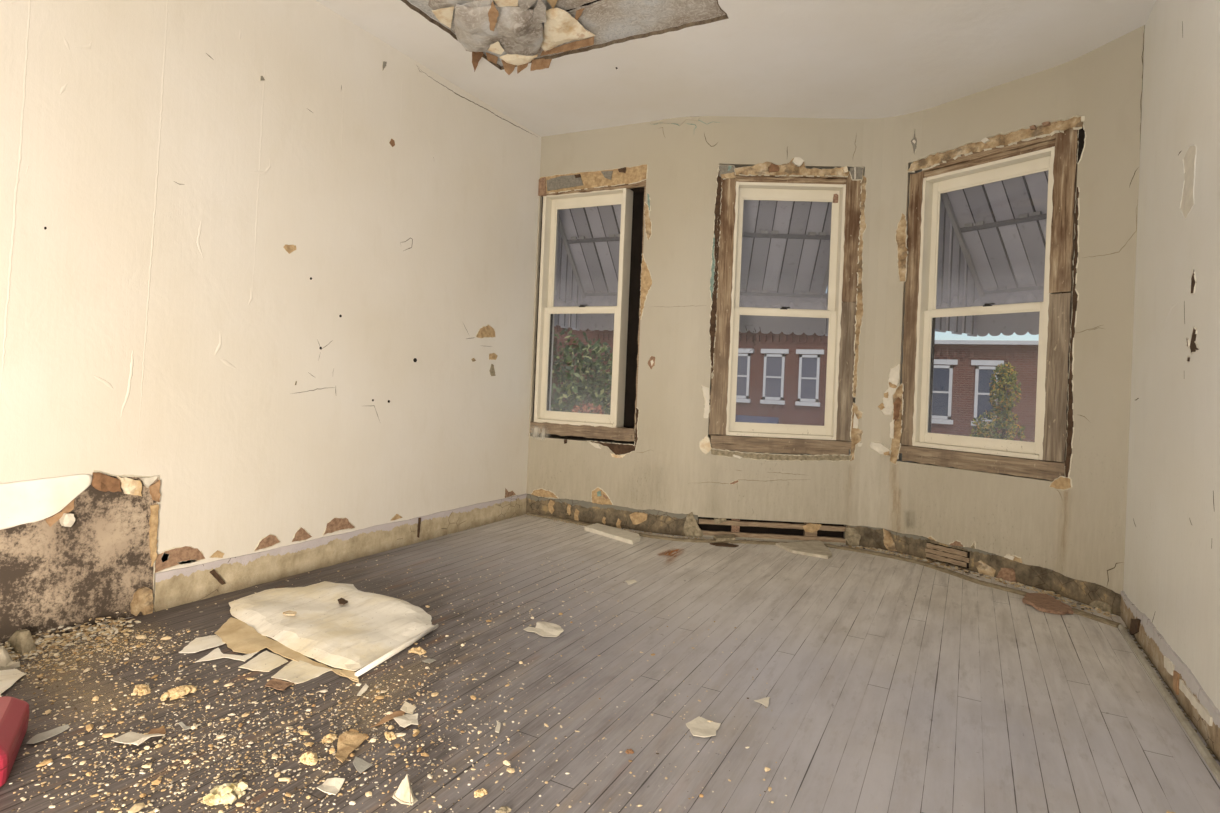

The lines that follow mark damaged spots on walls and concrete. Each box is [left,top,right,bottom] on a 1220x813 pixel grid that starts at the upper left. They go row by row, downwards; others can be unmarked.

spalling [401,0,458,41]
spalling [482,0,728,70]
flaking render [907,115,1087,173]
crack [1085,27,1145,258]
flaking render [895,213,908,282]
flaking render [699,157,904,465]
spalling [1186,326,1199,363]
peeling [591,487,613,505]
water stain [0,470,161,646]
peeling [153,546,225,573]
peeling [292,517,355,542]
spalling [926,536,976,569]